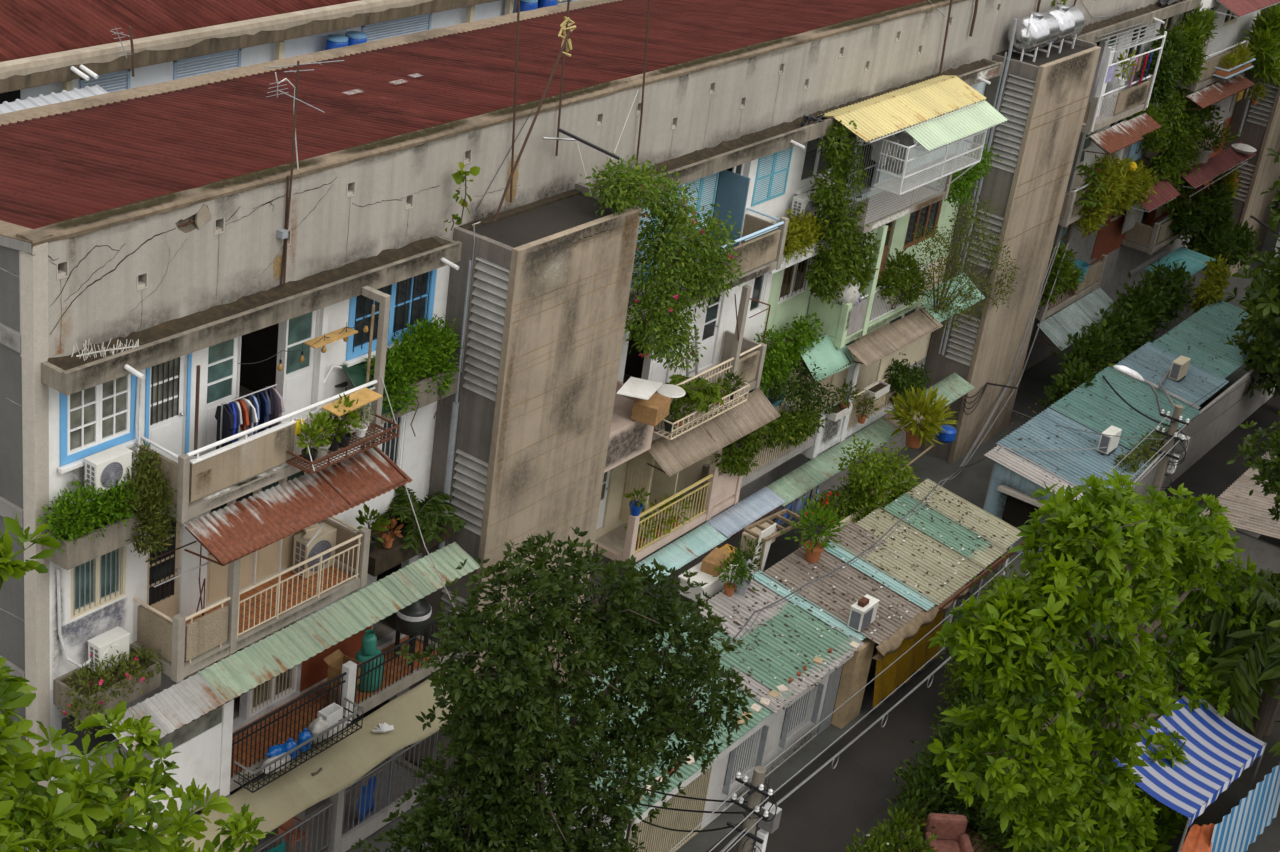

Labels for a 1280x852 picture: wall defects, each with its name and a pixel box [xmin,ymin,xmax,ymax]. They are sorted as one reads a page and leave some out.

crack [1,228,187,354]
crack [216,177,451,298]
water stain [512,213,639,324]
water stain [489,311,647,527]